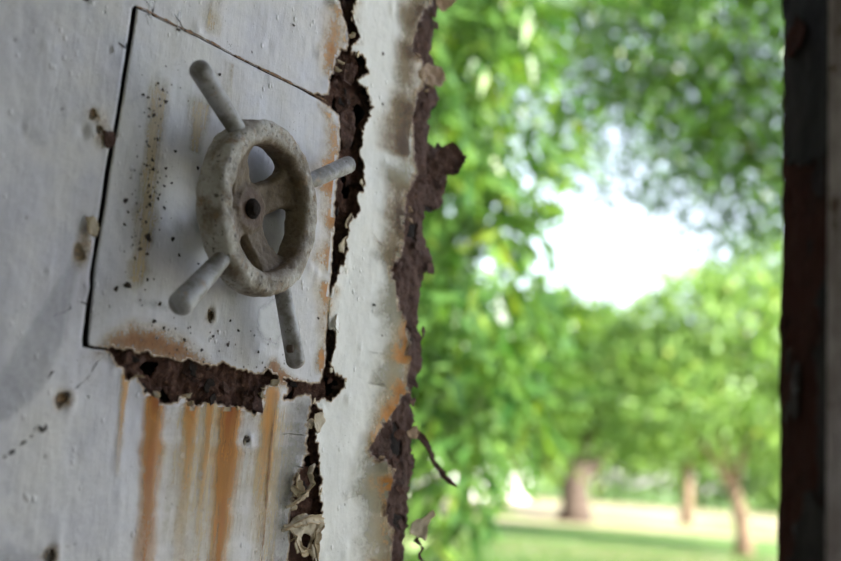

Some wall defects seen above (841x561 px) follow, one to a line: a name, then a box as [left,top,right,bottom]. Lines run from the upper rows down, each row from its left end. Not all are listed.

crack [57,1,328,391]
rust [119,375,129,434]
rust [140,396,164,561]
rust [98,319,211,365]
spalling [102,347,298,413]
rust [174,403,241,561]